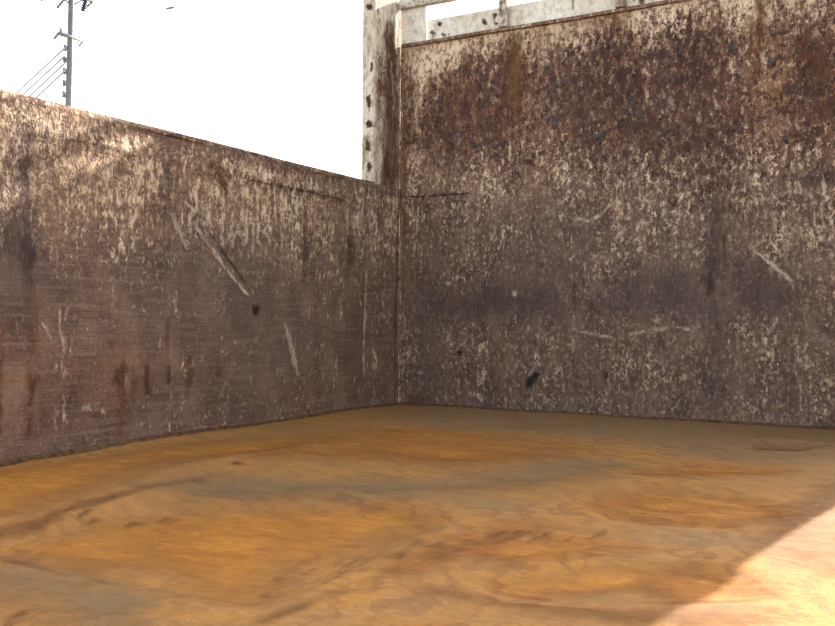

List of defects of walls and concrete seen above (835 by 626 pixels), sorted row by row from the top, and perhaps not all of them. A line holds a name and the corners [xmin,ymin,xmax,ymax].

rust [382,0,835,215]